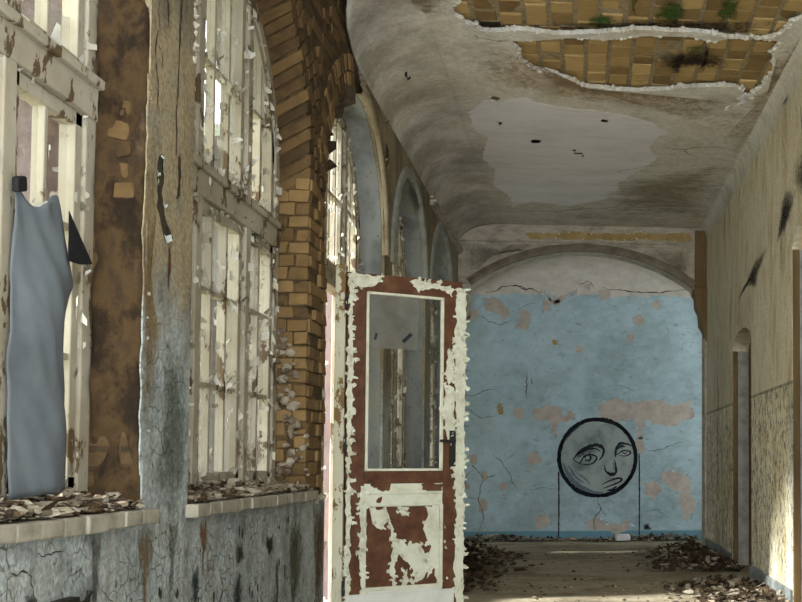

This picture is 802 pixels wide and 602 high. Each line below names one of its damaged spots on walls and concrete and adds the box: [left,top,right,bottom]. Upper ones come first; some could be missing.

peeling [50,23,61,45]
peeling [467,96,668,207]
damp [777,156,802,240]
flaking render [74,0,173,502]
flaking render [188,0,369,504]
damp [740,252,765,297]
peeling [597,397,695,454]
crack [465,454,553,527]
crack [10,551,63,597]
damp [138,535,152,602]
damp [233,580,241,602]
damp [290,523,301,602]